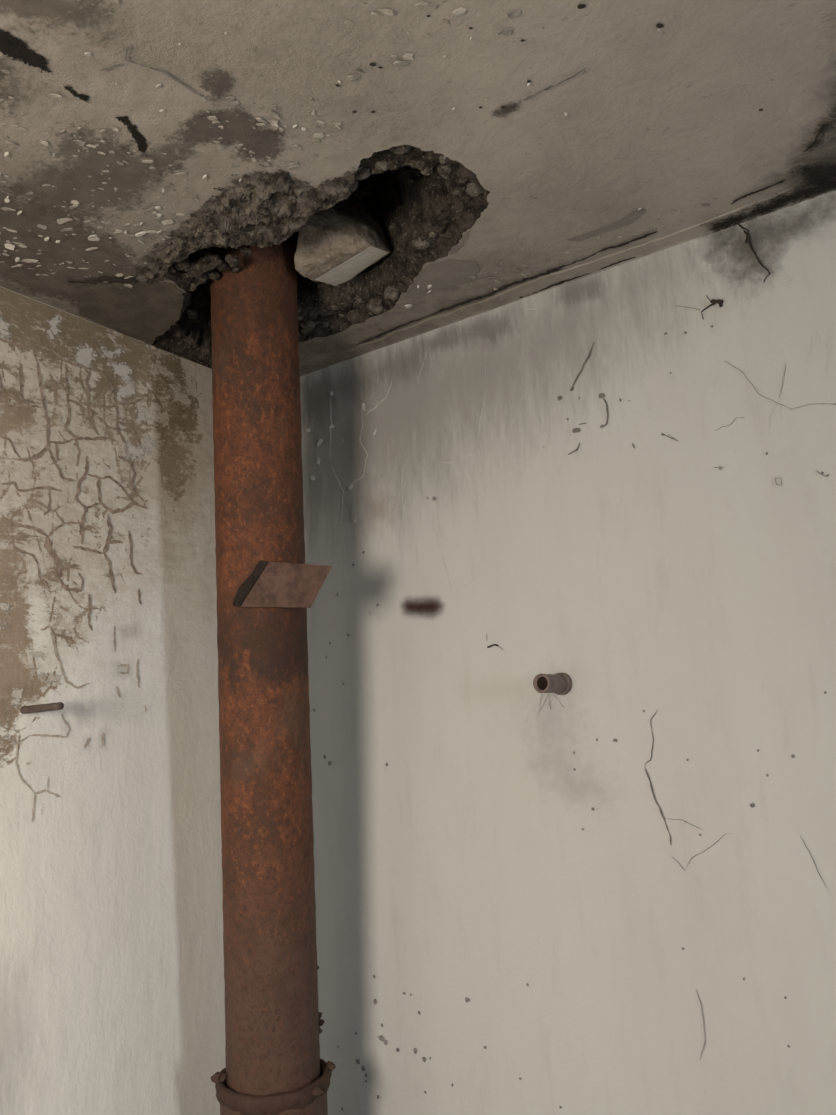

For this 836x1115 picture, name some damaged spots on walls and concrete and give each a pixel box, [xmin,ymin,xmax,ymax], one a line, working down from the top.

spalling [0,29,55,74]
spalling [47,85,89,102]
crack [0,338,147,711]
peeling [0,95,490,836]
crack [15,713,104,822]
crack [644,711,730,871]